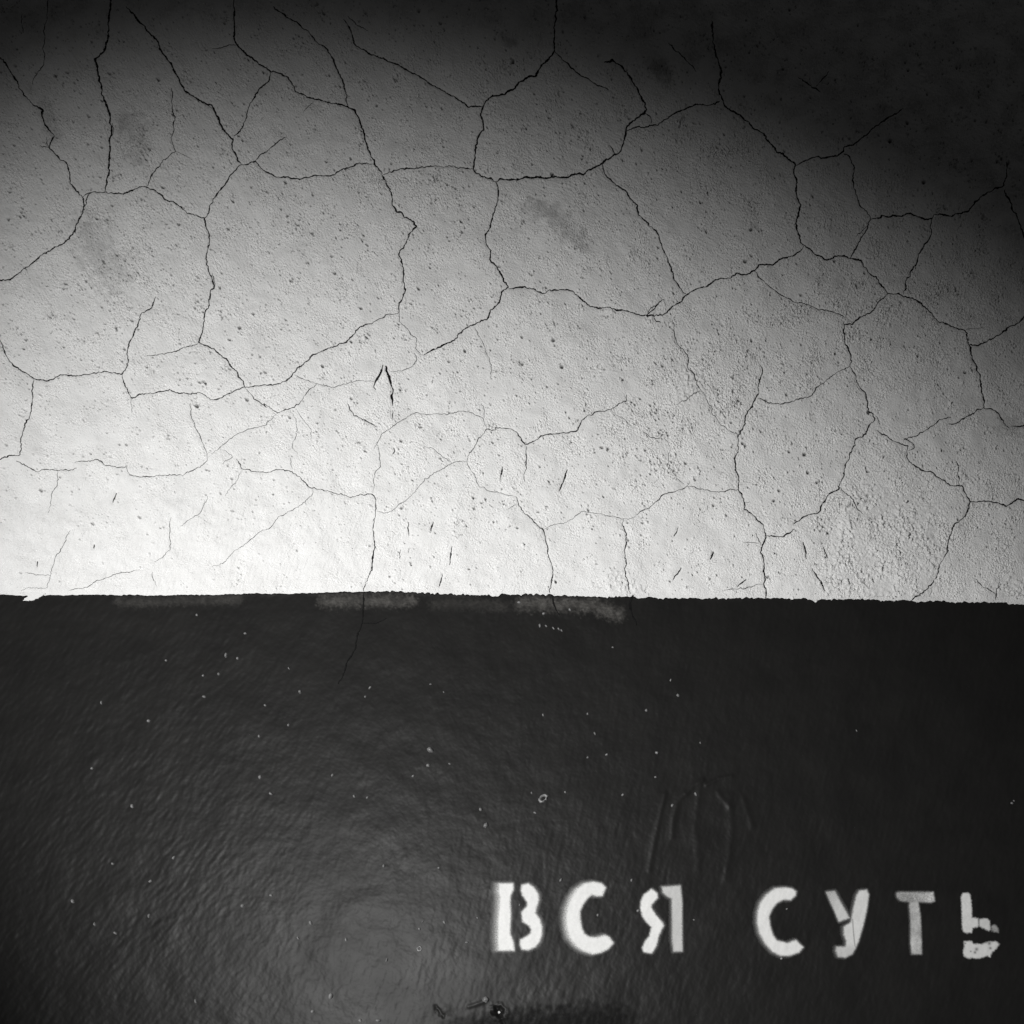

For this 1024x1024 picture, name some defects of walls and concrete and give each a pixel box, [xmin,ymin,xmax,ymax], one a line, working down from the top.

crack [0,0,1024,684]